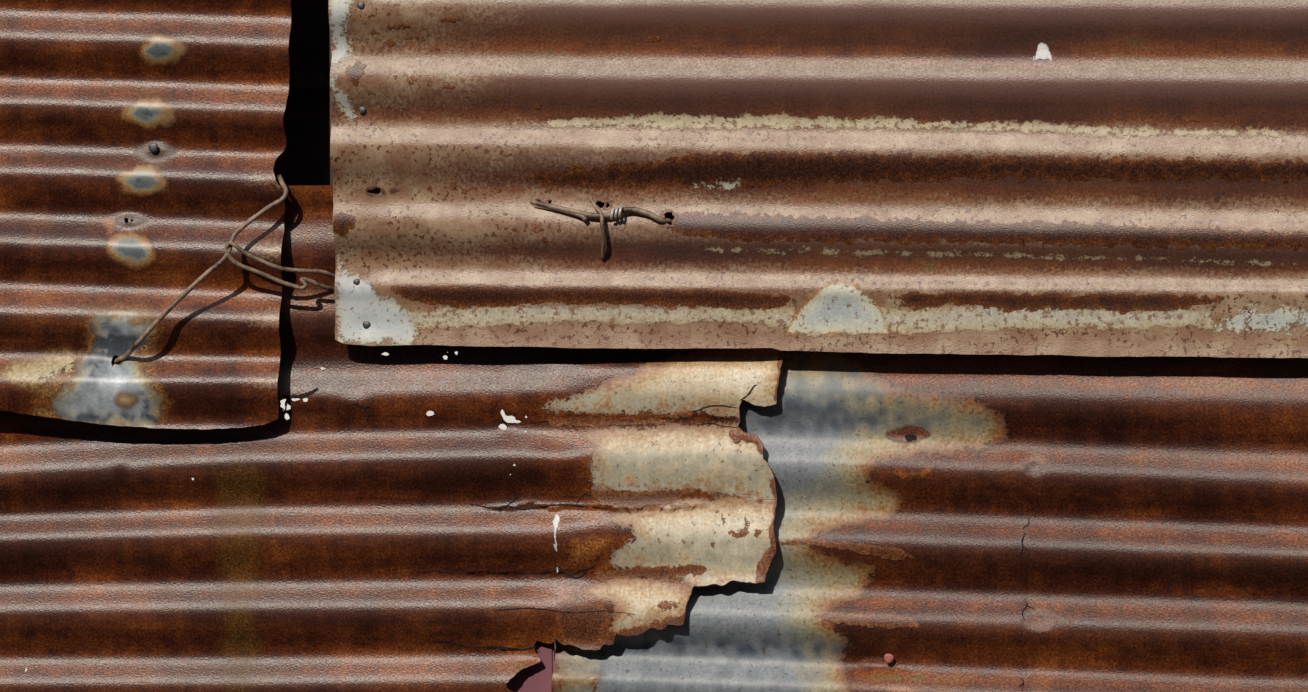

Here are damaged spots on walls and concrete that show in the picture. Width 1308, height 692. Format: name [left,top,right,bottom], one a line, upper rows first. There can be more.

rust [493,148,1308,193]
rust [333,212,356,237]
rust [651,211,1308,251]
peeling [335,255,419,345]
rust [391,283,791,310]
rust [888,289,1224,316]
peeling [1214,300,1308,342]
rust [17,295,180,425]
peeling [49,306,167,428]
peeling [542,278,1010,692]
rust [779,538,919,561]
rust [814,610,919,629]